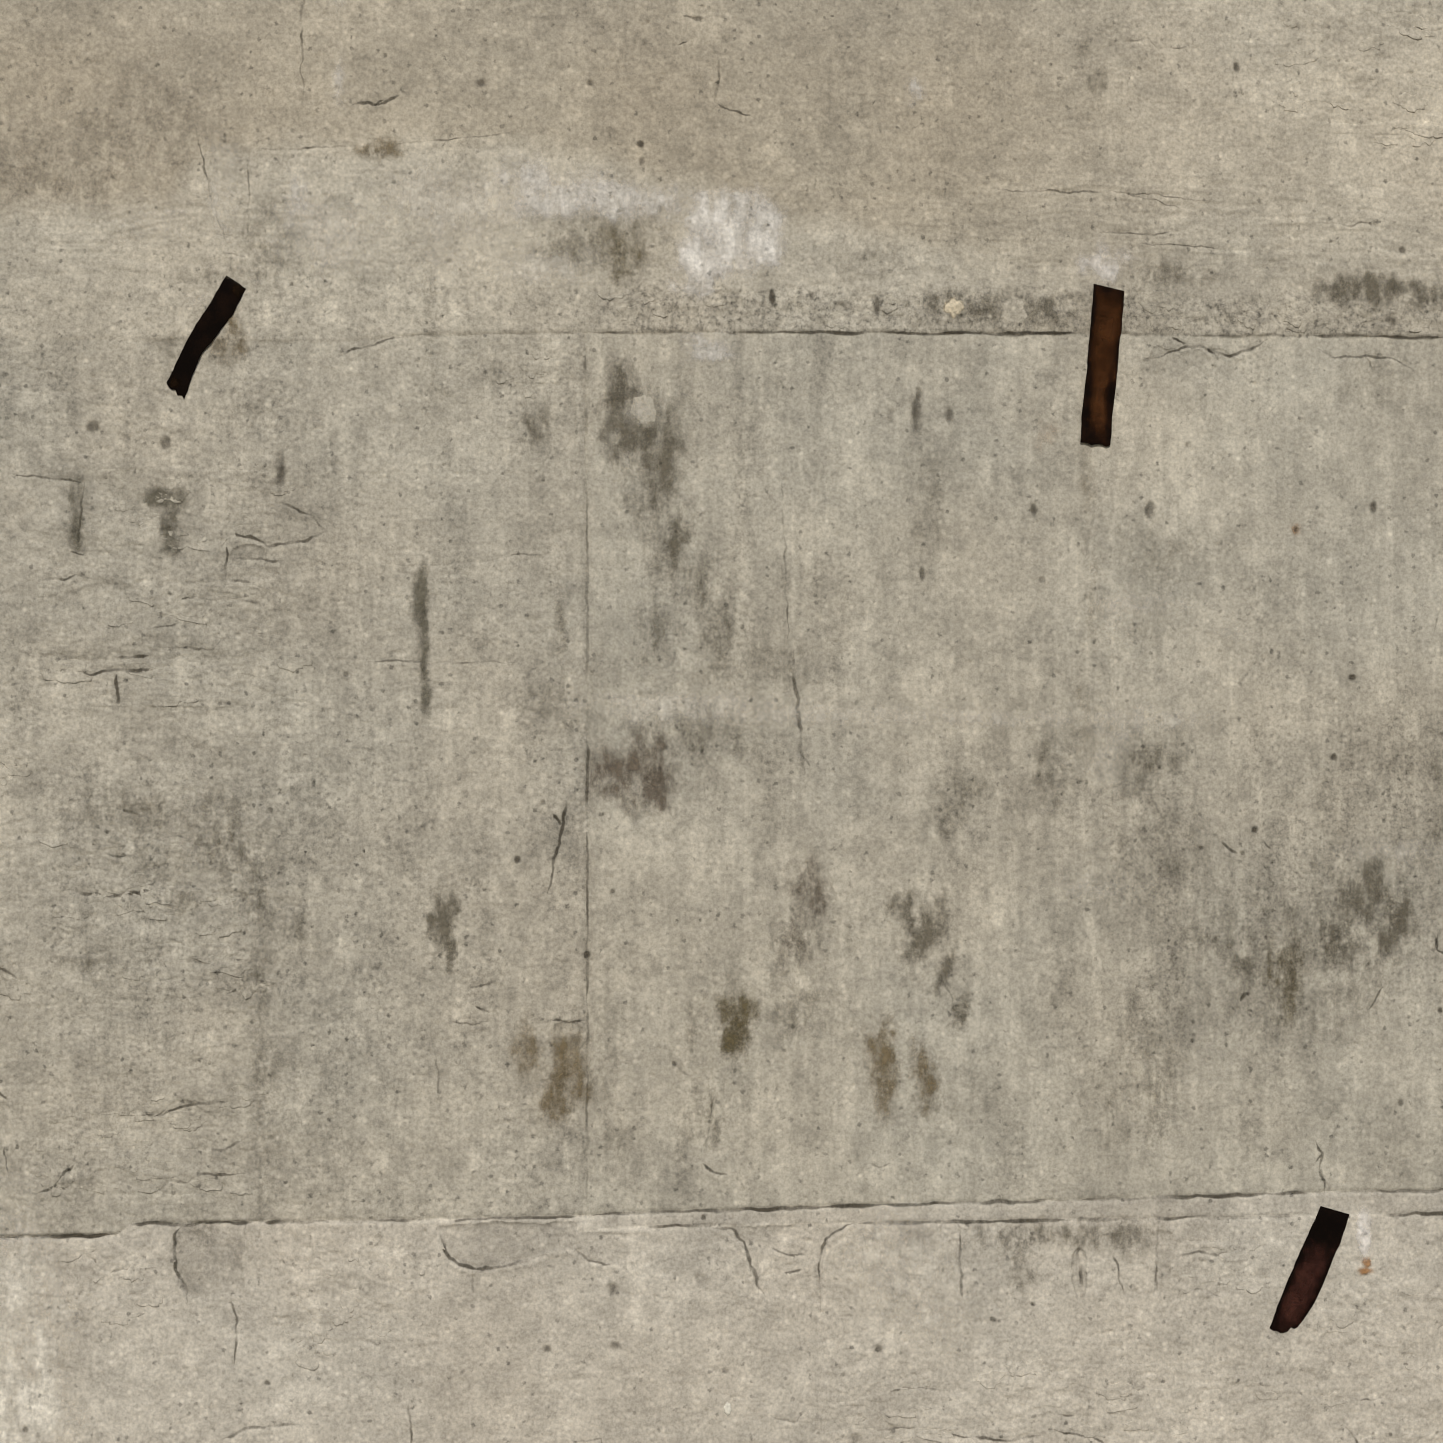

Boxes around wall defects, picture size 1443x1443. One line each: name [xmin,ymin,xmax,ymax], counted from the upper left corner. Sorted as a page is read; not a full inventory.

rust [1092,299,1119,423]
water stain [601,368,682,504]
water stain [668,522,689,560]
water stain [414,567,431,706]
water stain [591,697,695,810]
water stain [890,894,943,958]
water stain [1344,863,1386,921]
water stain [1379,901,1409,954]
water stain [936,956,953,989]
rust [1282,1252,1325,1321]